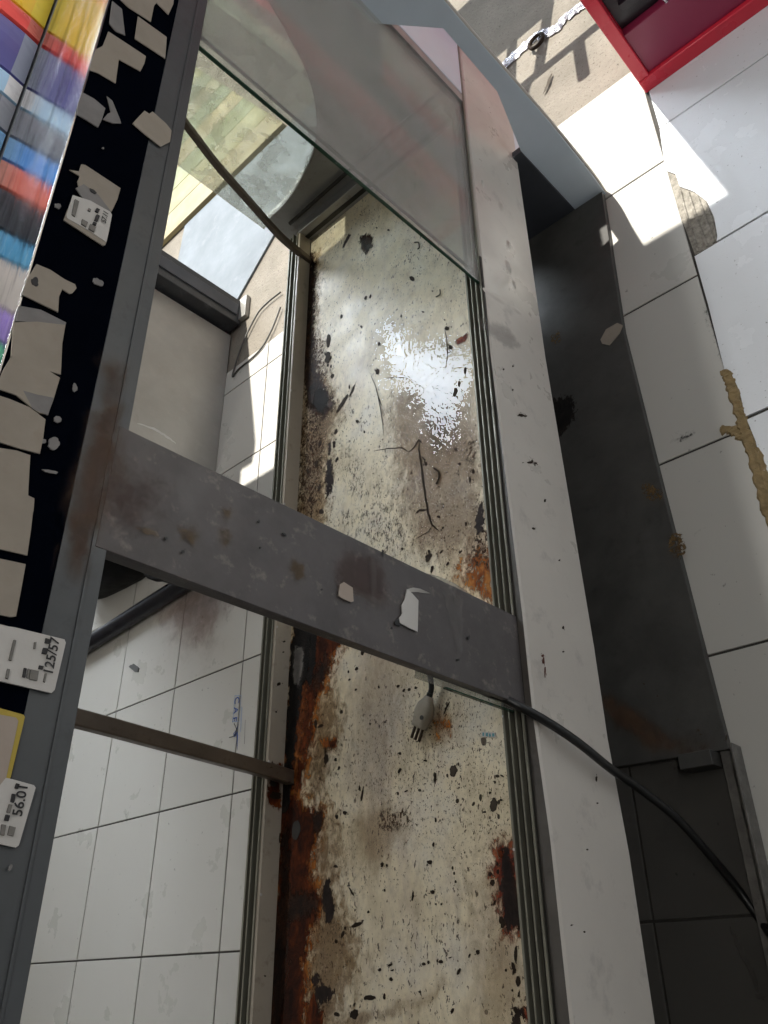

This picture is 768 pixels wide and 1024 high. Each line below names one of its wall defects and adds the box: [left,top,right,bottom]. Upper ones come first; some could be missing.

crack [371,377,439,539]
rust [445,546,492,605]
rust [267,636,360,1024]